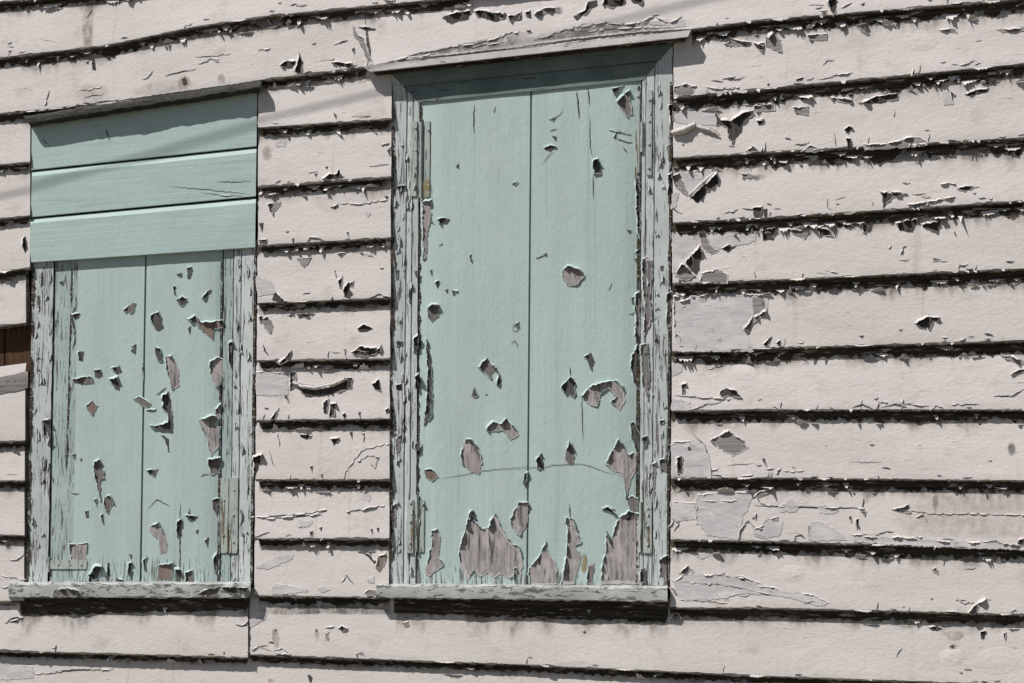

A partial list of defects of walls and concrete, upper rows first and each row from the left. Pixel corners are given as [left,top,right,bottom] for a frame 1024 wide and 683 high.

peeling [0,0,643,89]
peeling [258,166,459,302]
peeling [70,453,115,524]
peeling [72,366,122,390]
spalling [133,346,180,451]
peeling [172,266,224,341]
peeling [238,261,390,334]
peeling [247,453,389,501]
peeling [247,333,434,465]
crack [345,350,406,471]
crack [440,395,752,531]
peeling [400,61,1024,641]